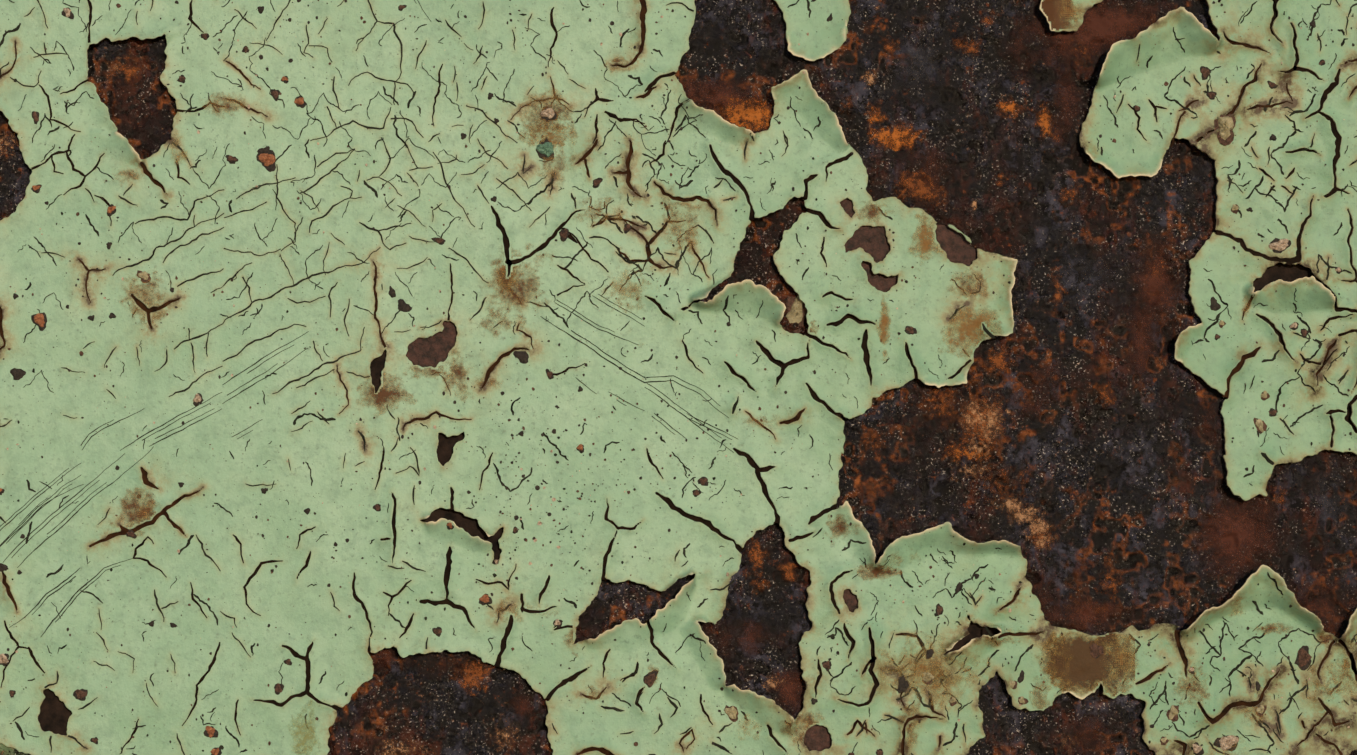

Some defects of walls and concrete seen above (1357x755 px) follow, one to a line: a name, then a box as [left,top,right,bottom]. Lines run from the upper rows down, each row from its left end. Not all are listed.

spalling [1210,296,1221,311]
peeling [406,321,457,368]
spalling [10,368,26,380]
peeling [370,350,387,393]
rust [673,0,1357,755]
crack [1107,572,1357,755]